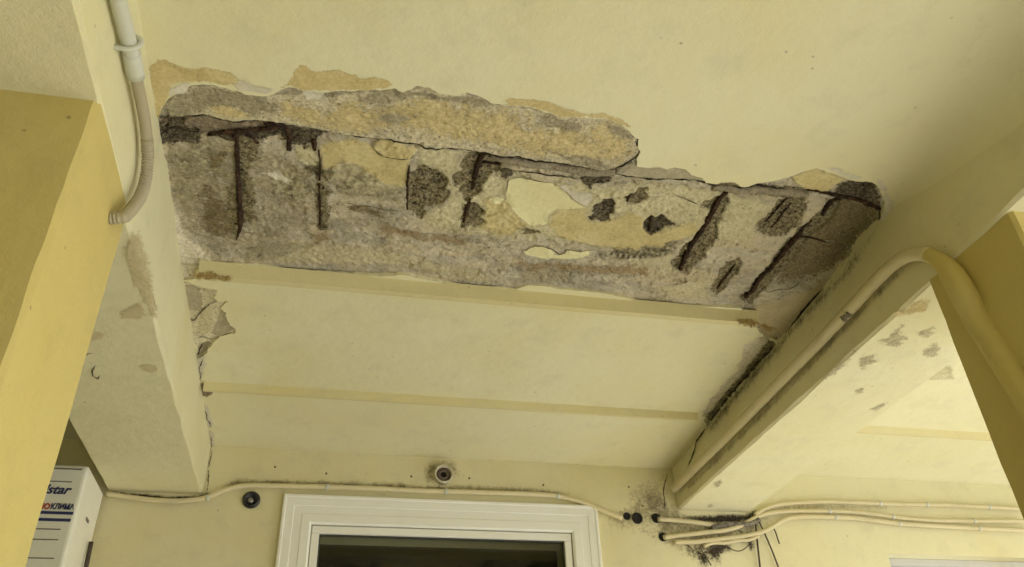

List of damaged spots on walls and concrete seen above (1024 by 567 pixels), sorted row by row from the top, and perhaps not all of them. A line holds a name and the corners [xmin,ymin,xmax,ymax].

corrosion [159,115,330,233]
corrosion [305,166,335,244]
corrosion [376,151,513,246]
spalling [149,59,894,424]
corrosion [578,175,612,189]
corrosion [670,181,882,304]
crack [197,357,215,490]
damp [637,493,755,564]